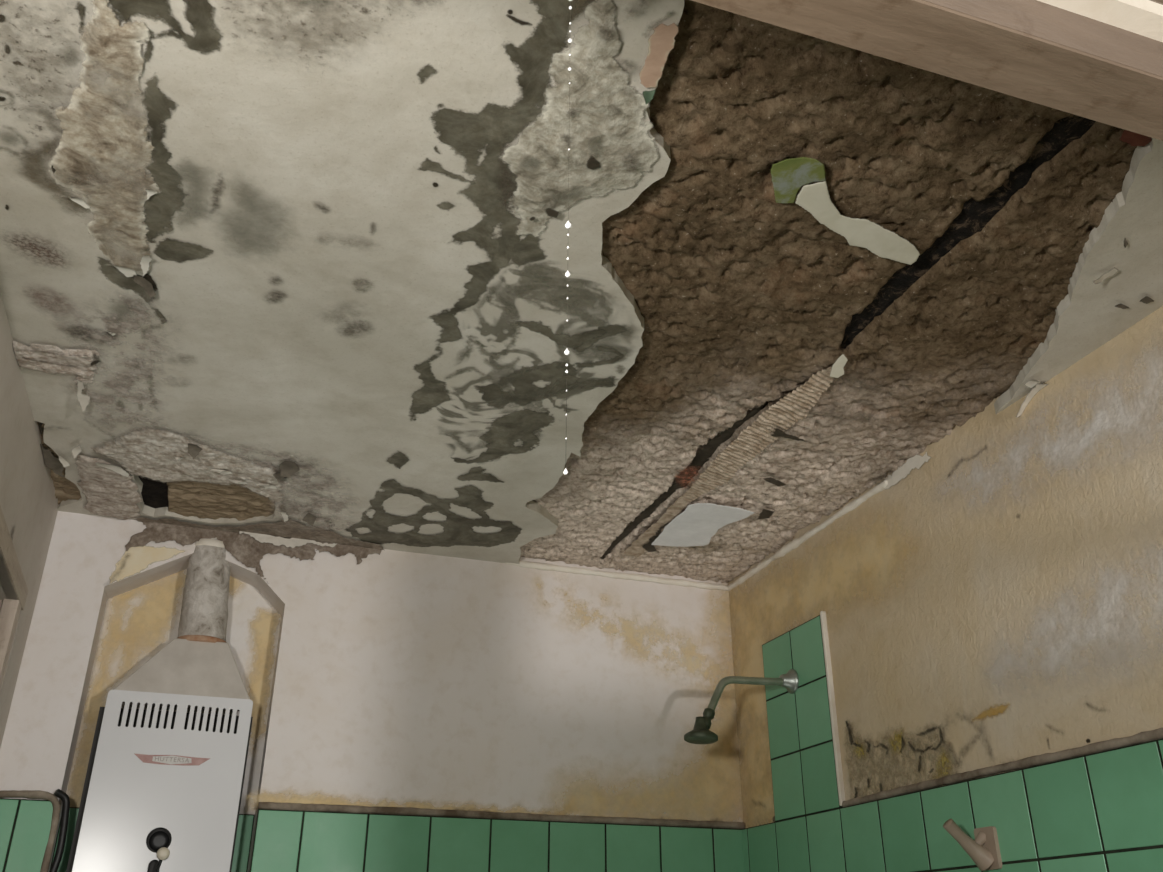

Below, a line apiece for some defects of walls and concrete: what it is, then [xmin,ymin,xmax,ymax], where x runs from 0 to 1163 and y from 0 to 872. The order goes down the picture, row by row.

water stain [108,0,222,62]
water stain [0,0,86,210]
peeling [48,0,161,298]
water stain [142,76,222,263]
water stain [12,237,63,265]
water stain [67,257,167,342]
water stain [344,0,633,547]
spalling [502,0,1163,583]
peeling [13,340,100,412]
peeling [37,421,351,548]
peeling [846,721,956,798]